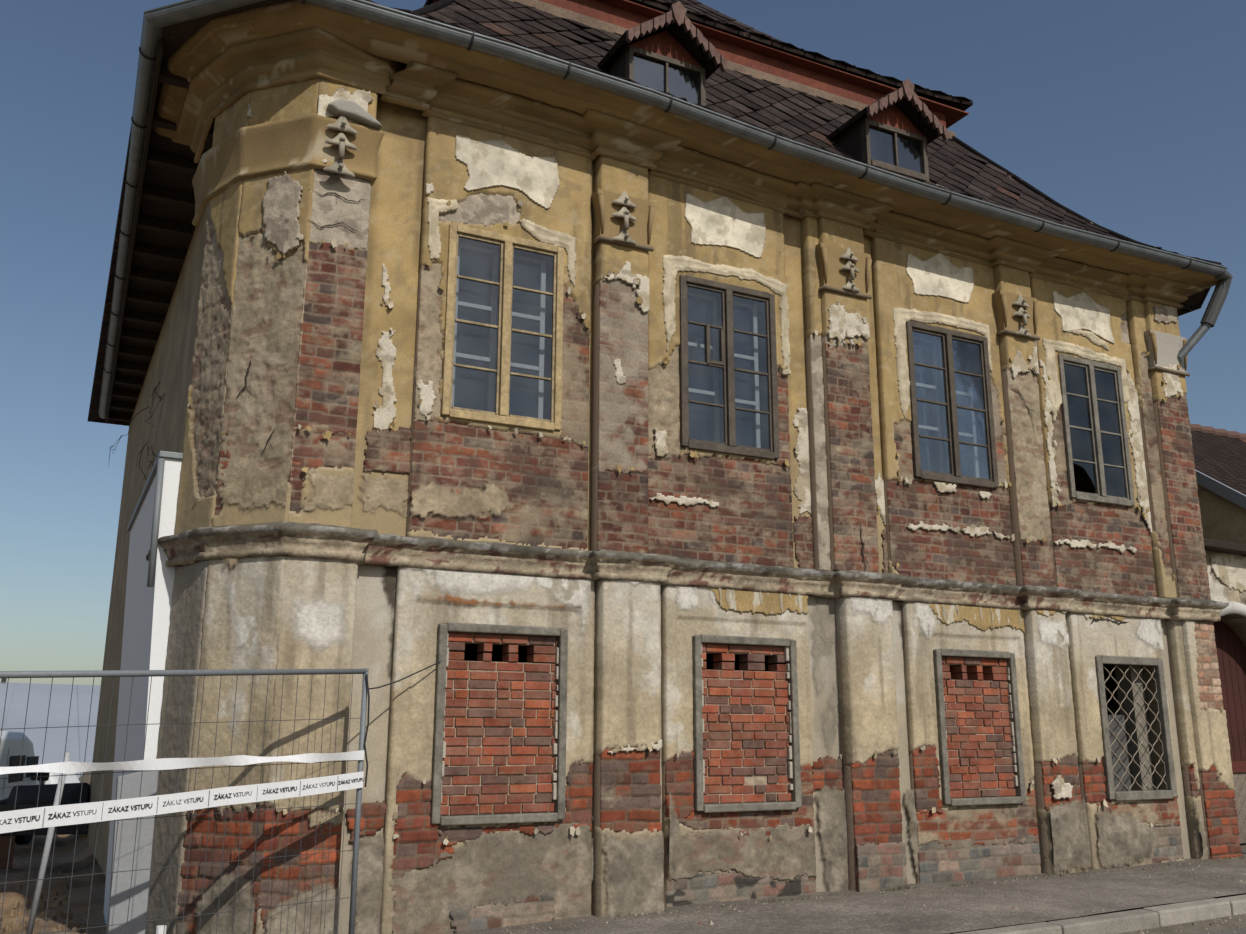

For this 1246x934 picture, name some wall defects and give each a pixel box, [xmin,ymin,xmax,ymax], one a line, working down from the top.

crack [236,356,252,398]
spalling [187,159,1246,600]
peeling [709,580,809,616]
spalling [176,740,1242,934]